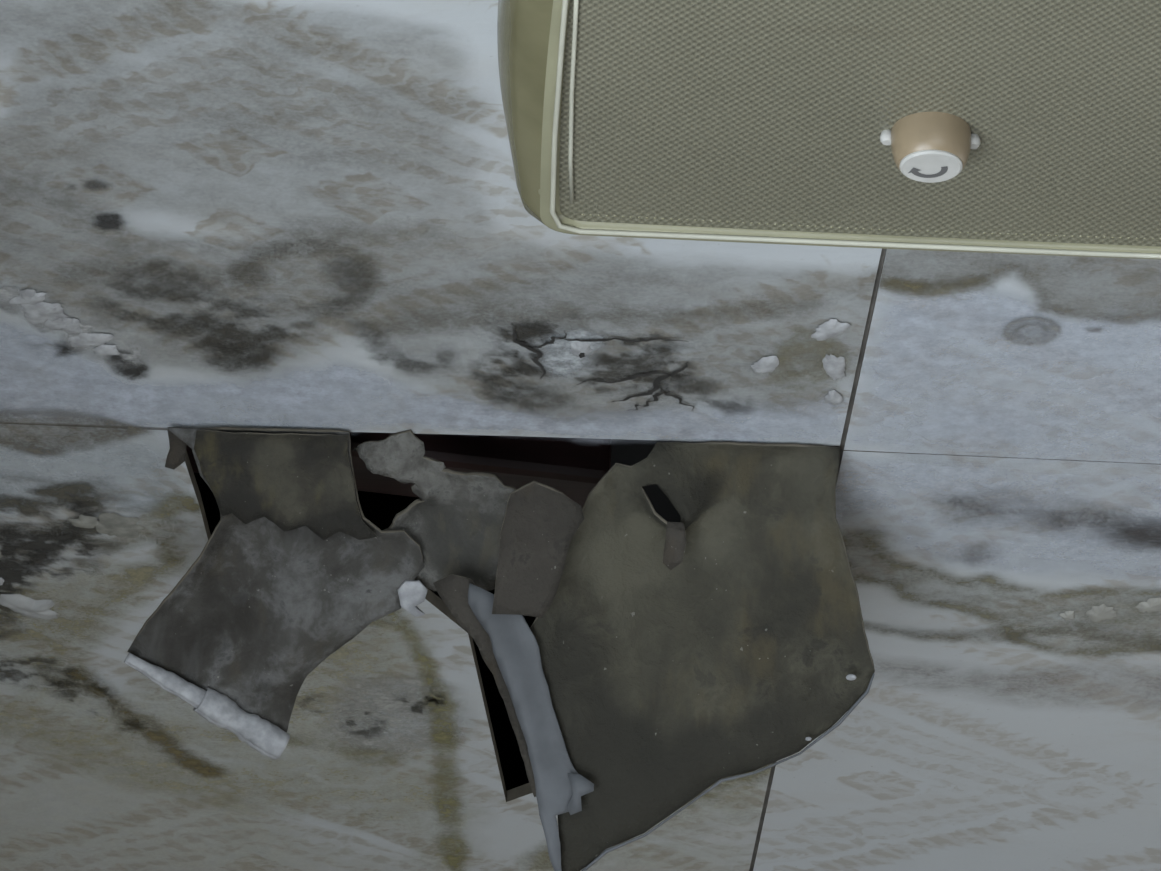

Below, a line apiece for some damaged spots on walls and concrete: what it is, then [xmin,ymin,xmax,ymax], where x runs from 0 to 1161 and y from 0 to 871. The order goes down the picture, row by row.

water stain [95,215,121,230]
water stain [121,302,288,368]
water stain [0,319,851,473]
water stain [880,250,1161,392]
water stain [0,483,309,794]
water stain [843,532,1161,656]
water stain [1051,512,1161,546]
water stain [290,611,463,871]